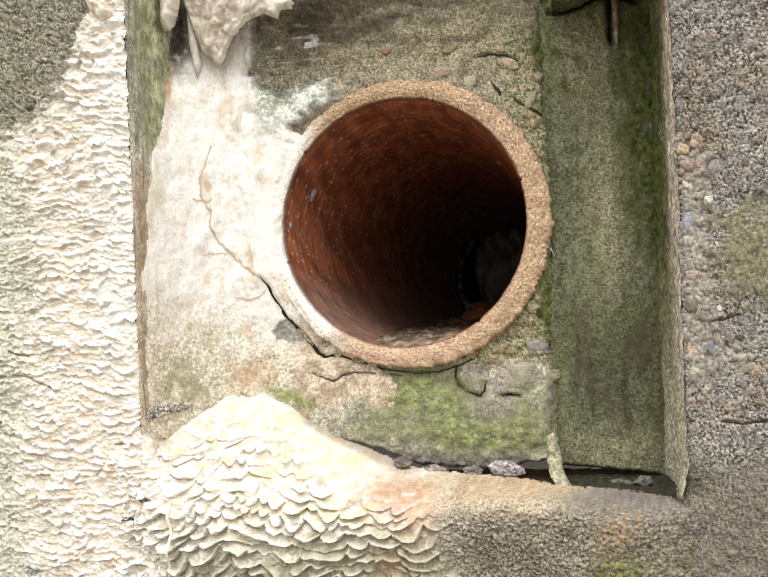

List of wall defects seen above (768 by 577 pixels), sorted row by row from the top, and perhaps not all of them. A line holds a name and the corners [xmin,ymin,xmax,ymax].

crack [192,146,520,398]